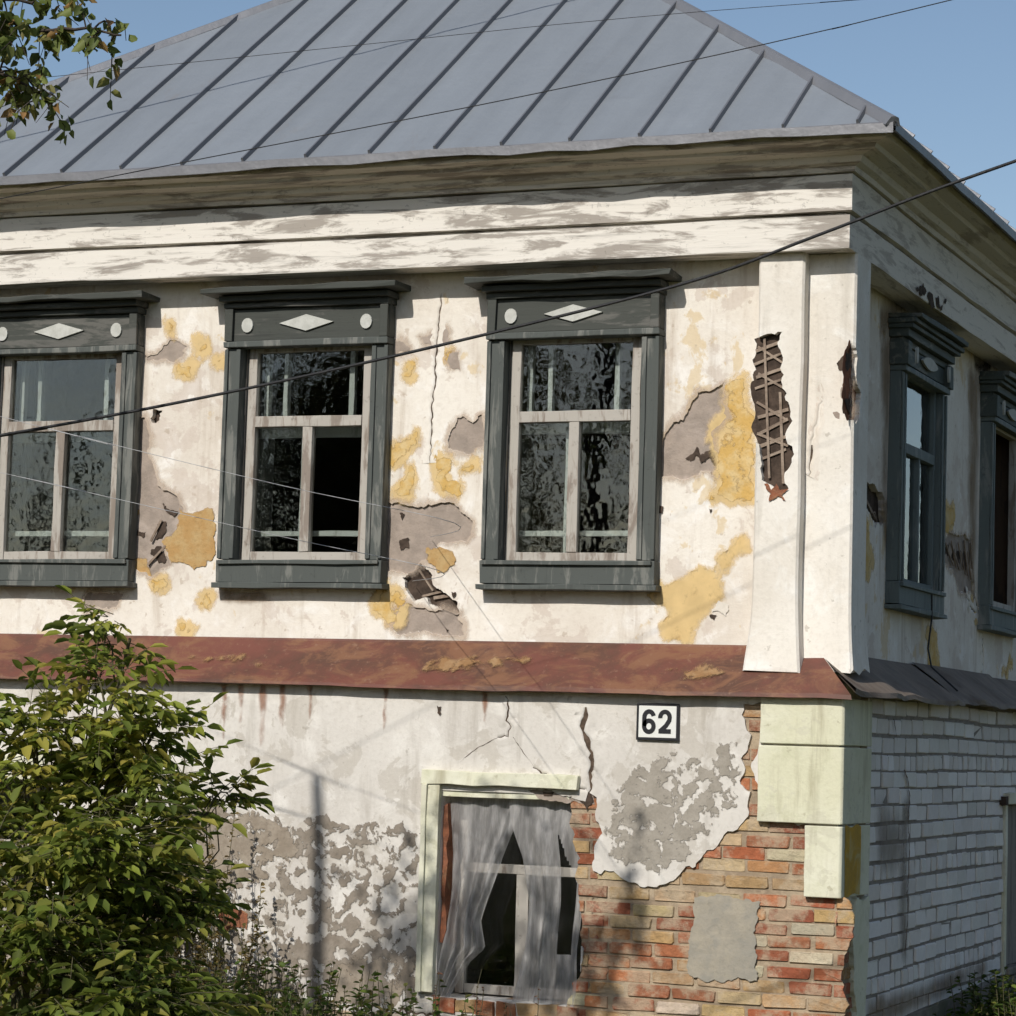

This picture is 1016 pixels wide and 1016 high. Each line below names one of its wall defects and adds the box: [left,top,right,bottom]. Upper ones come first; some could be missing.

flaking render [136,410,216,595]
flaking render [368,414,485,640]
crack [421,293,451,464]
peeling [647,535,752,644]
flaking render [661,372,788,513]
flaking render [833,340,856,421]
flaking render [865,484,879,583]
corrosion [422,655,530,672]
corrosion [684,664,724,679]
crack [460,692,604,801]
peeling [181,797,461,1016]
flaking render [530,702,861,1016]